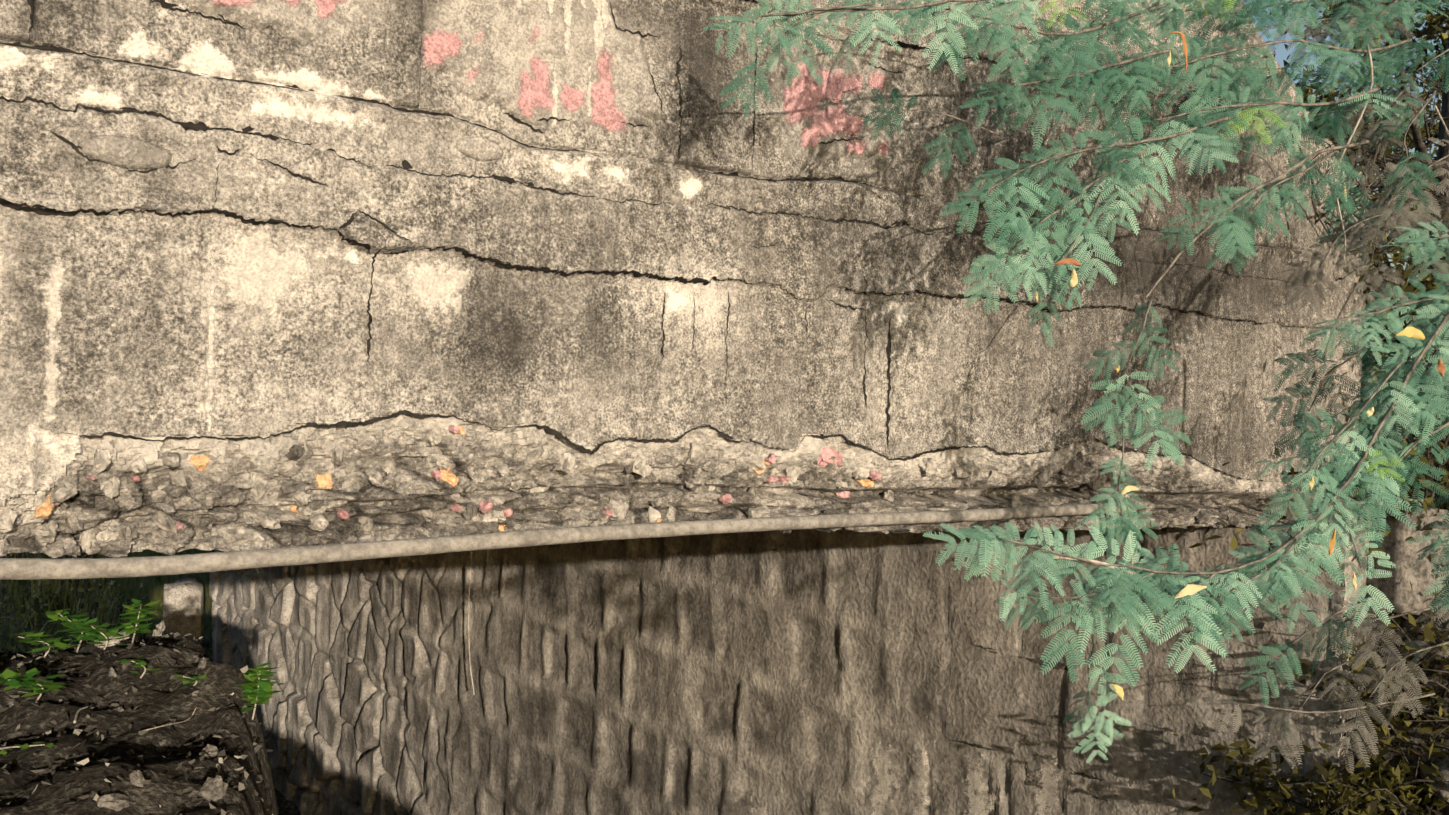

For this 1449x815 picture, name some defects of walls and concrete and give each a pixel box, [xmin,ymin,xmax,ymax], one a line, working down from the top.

crack [0,0,1333,478]
water stain [27,263,81,464]
spalling [0,413,1355,558]